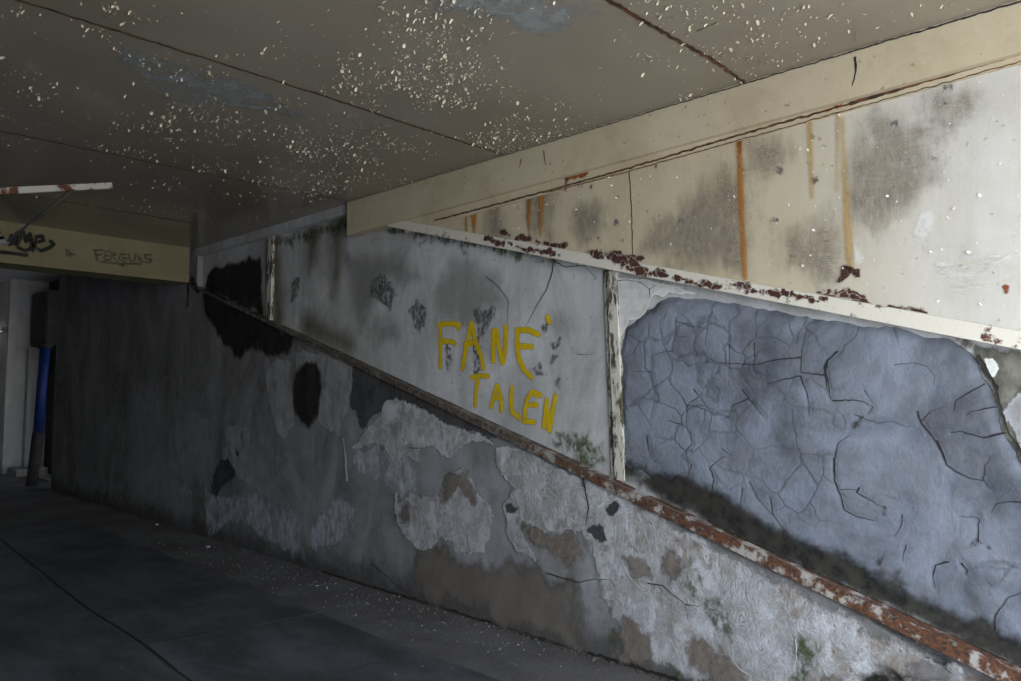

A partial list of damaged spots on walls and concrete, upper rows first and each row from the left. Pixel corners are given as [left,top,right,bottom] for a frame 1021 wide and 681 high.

corrosion [736,141,746,279]
flaking render [984,358,999,377]
crack [633,317,1021,558]
flaking render [265,350,945,681]
crack [933,561,968,585]
crack [647,583,700,619]
crack [994,592,1021,630]